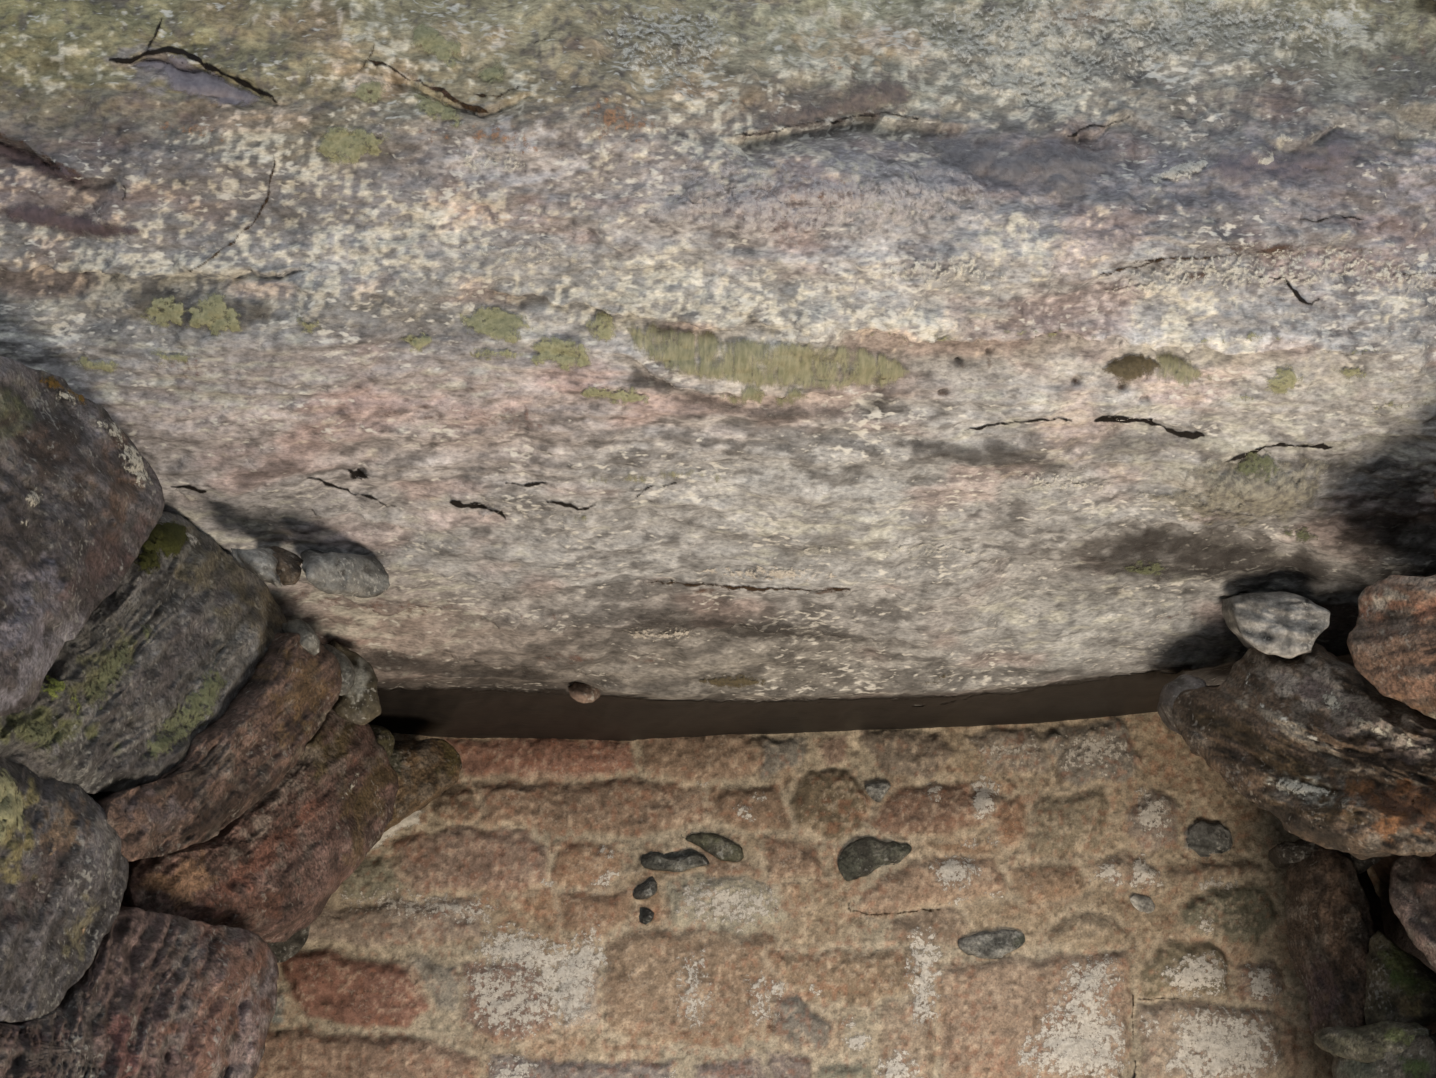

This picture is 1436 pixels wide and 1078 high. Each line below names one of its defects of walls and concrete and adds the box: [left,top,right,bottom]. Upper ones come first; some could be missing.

crack [109,19,277,103]
crack [965,416,1332,462]